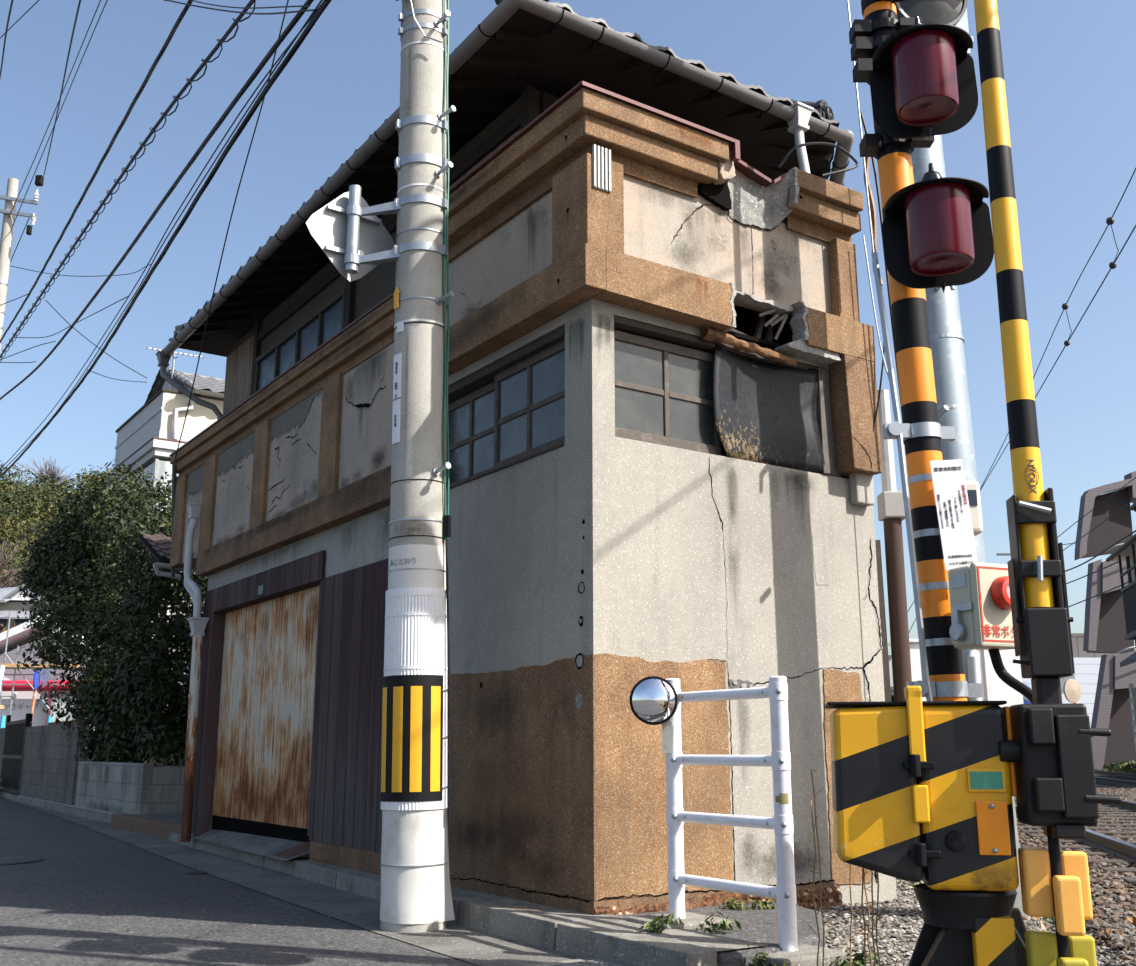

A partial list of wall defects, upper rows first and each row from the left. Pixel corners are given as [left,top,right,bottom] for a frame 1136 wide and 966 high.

spalling [697,151,802,229]
crack [671,204,779,295]
peeling [187,432,255,496]
peeling [270,388,323,465]
crack [451,460,883,906]